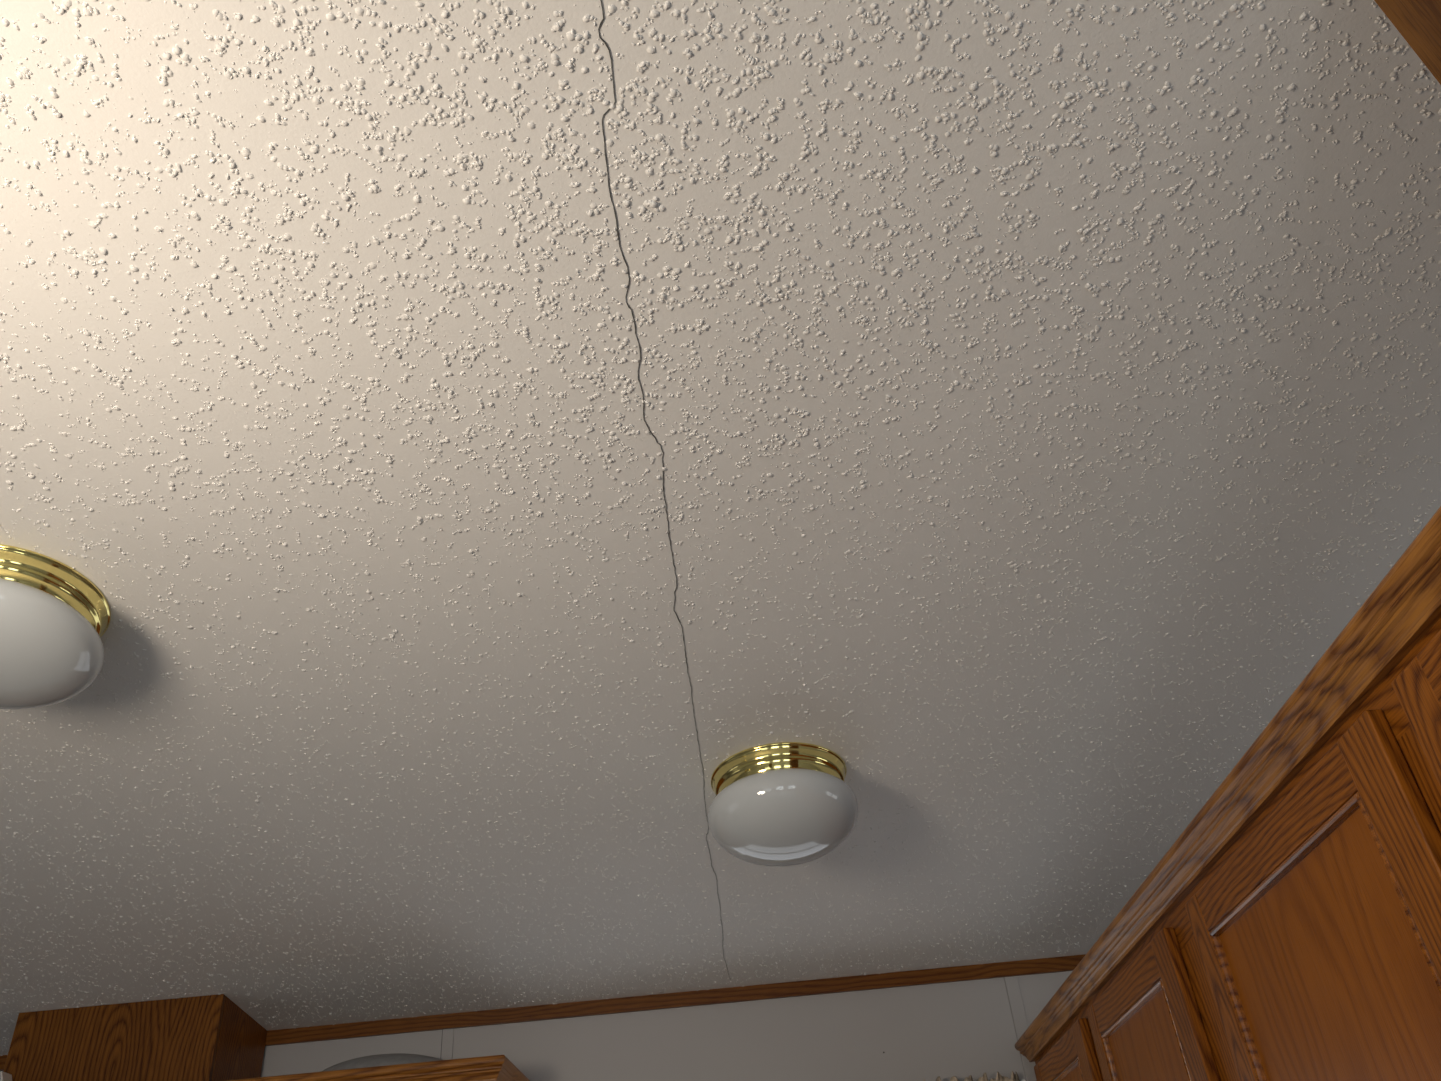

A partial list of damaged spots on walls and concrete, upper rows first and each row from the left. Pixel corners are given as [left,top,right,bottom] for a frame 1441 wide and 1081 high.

crack [598,1,731,980]